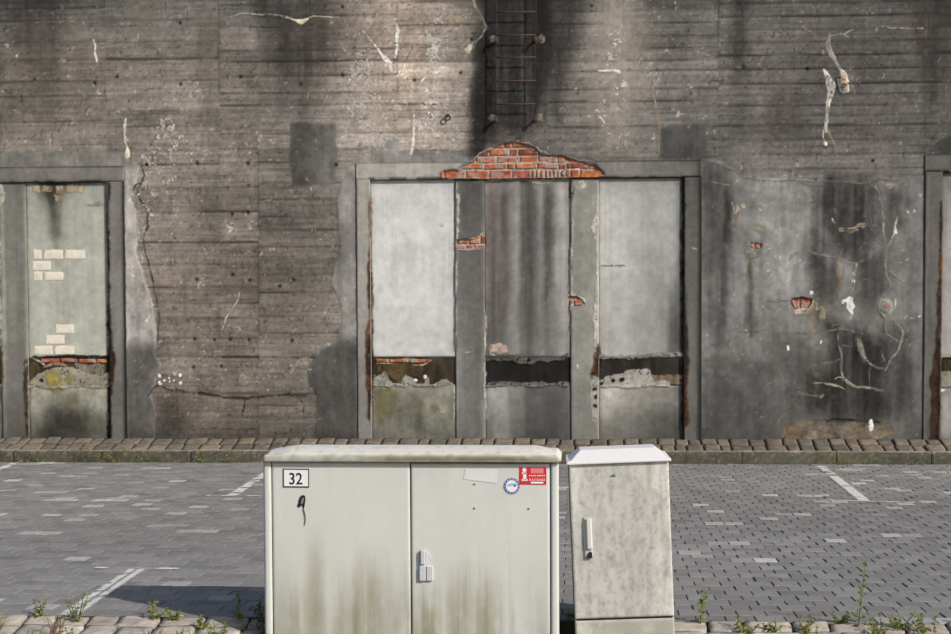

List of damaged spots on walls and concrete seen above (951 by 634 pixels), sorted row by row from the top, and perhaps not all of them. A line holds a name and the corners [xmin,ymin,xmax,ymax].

leakage [472,0,575,153]
spalling [822,30,852,146]
flaking render [25,324,110,389]
crack [133,166,160,340]
crack [148,384,306,415]
flaking render [372,358,456,417]
flaking render [441,141,683,423]
crack [749,177,905,399]
leakage [797,311,903,422]
leakage [824,178,893,298]
rust [929,201,943,441]
flaking render [941,354,951,392]